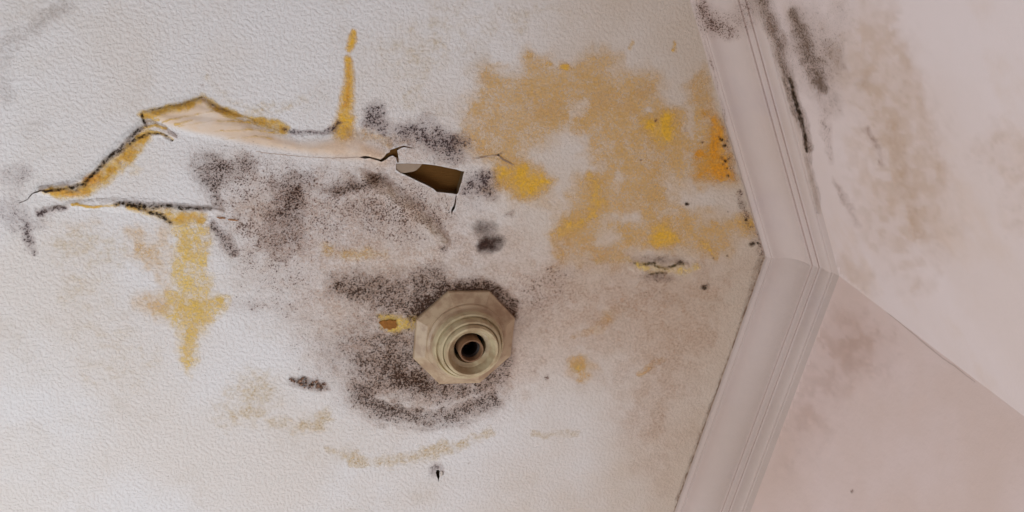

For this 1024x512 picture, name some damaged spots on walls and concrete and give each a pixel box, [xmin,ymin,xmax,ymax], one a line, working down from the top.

damp [115,141,578,431]
spalling [396,163,464,195]
damp [361,56,764,293]
damp [696,0,844,160]